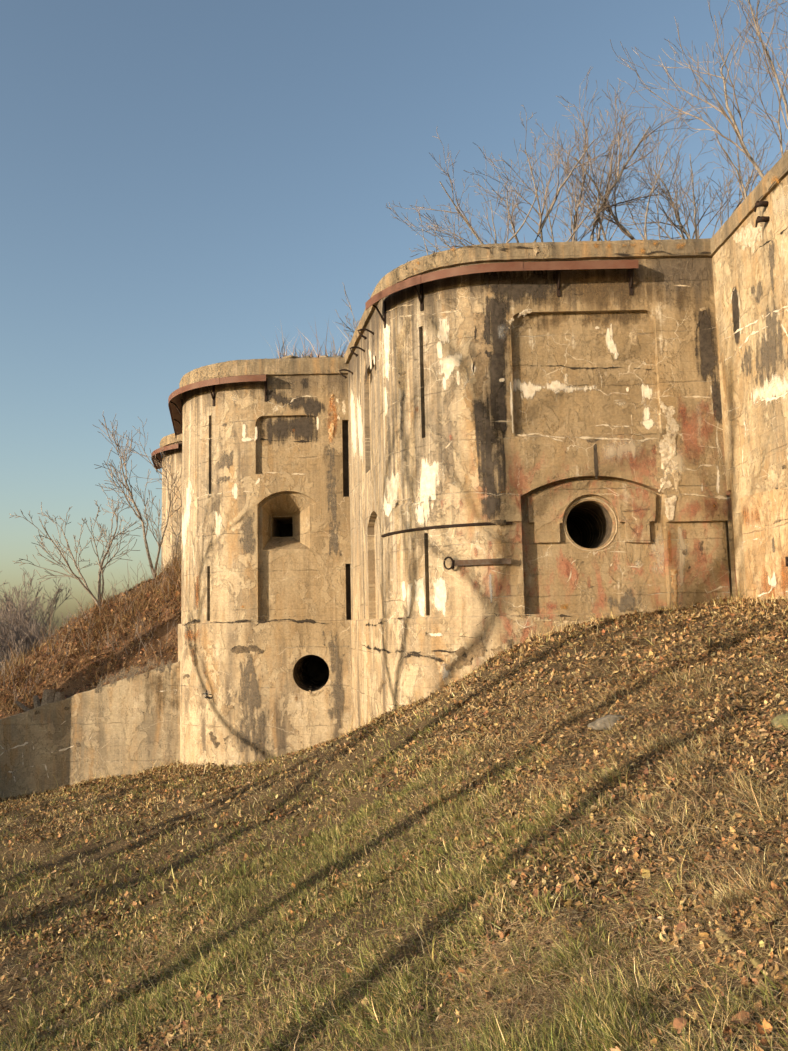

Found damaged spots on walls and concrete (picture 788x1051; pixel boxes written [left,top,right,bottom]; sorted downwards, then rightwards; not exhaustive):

crack [615,249,671,257]
leakage [732,222,788,405]
crack [662,288,788,500]
crack [610,509,663,586]
crack [184,618,326,626]
leakage [235,655,268,756]